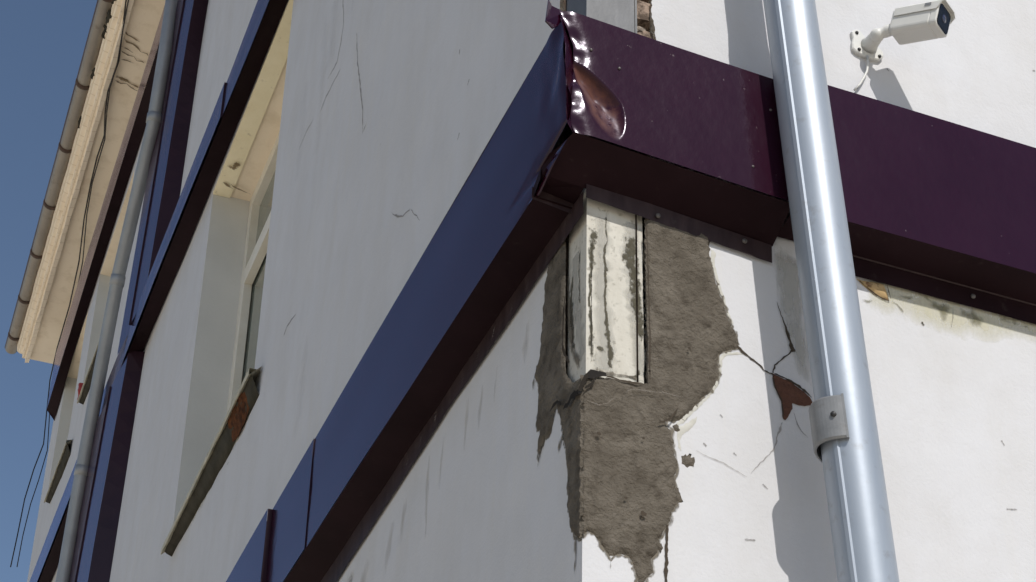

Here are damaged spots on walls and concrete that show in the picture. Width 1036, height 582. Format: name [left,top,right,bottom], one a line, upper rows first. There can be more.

spalling [634,0,656,40]
spalling [635,214,647,384]
peeling [711,250,734,324]
crack [737,303,795,374]
water stain [879,282,1006,329]
peeling [676,352,743,450]
spalling [772,373,812,420]
crack [703,414,803,475]